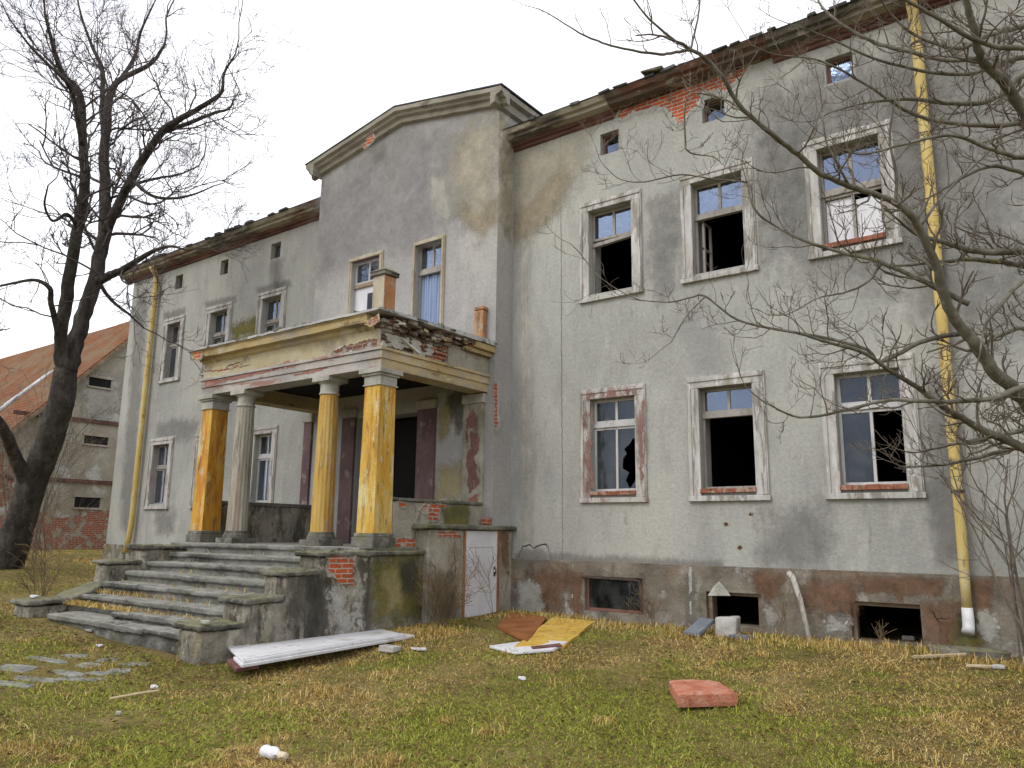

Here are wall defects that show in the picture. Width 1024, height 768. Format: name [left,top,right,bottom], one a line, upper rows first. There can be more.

flaking render [613,64,753,129]
flaking render [362,134,375,150]
flaking render [204,314,473,387]
water stain [326,113,587,540]
peeling [465,410,480,502]
peeling [582,388,646,492]
flaking render [30,506,110,549]
flaking render [397,499,463,540]
flaking render [323,549,366,634]